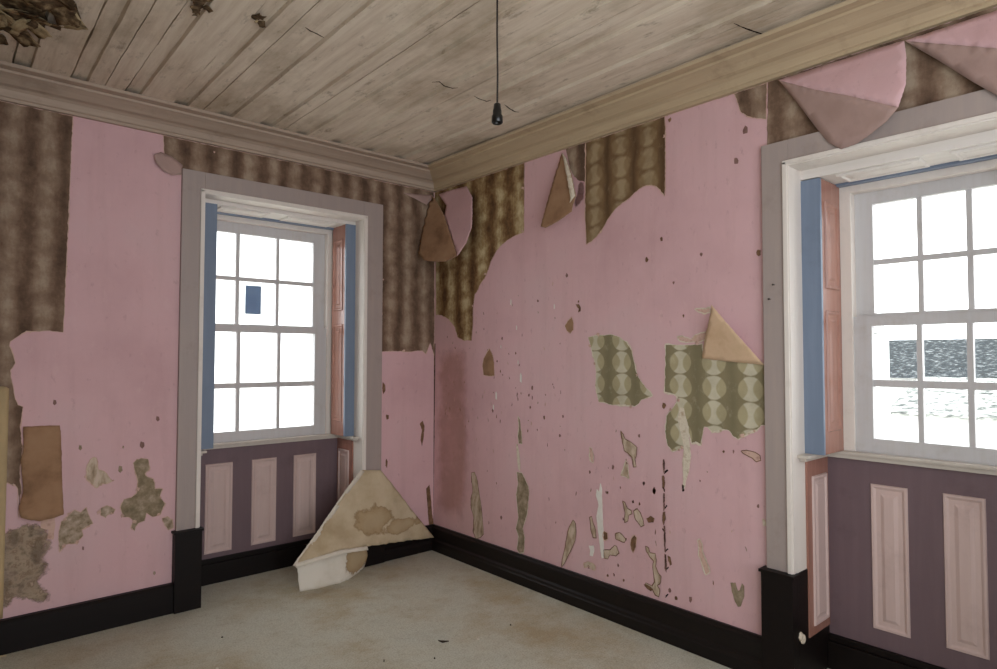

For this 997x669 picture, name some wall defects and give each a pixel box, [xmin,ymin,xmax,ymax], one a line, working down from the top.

peeling [0,0,88,47]
peeling [190,0,213,16]
peeling [251,13,267,28]
peeling [719,7,997,145]
peeling [566,116,671,245]
peeling [163,135,524,354]
peeling [0,101,74,518]
peeling [588,333,765,454]
water stain [3,524,51,607]